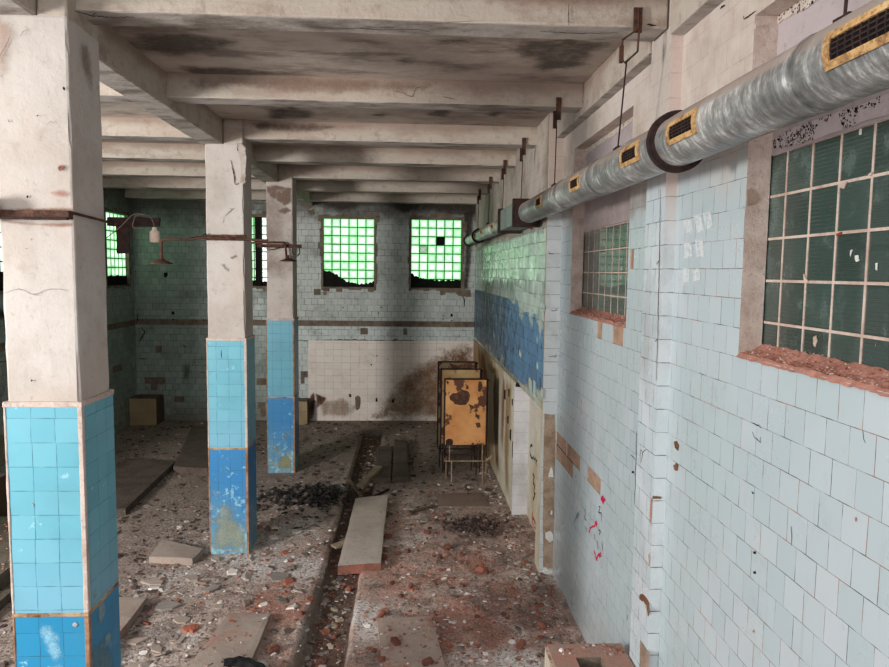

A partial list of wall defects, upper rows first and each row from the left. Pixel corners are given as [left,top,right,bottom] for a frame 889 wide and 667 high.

leakage [142,34,229,53]
leakage [523,42,602,70]
peeling [267,186,291,214]
peeling [514,285,545,315]
peeling [504,377,543,458]
peeling [556,432,601,493]
peeling [216,507,245,548]